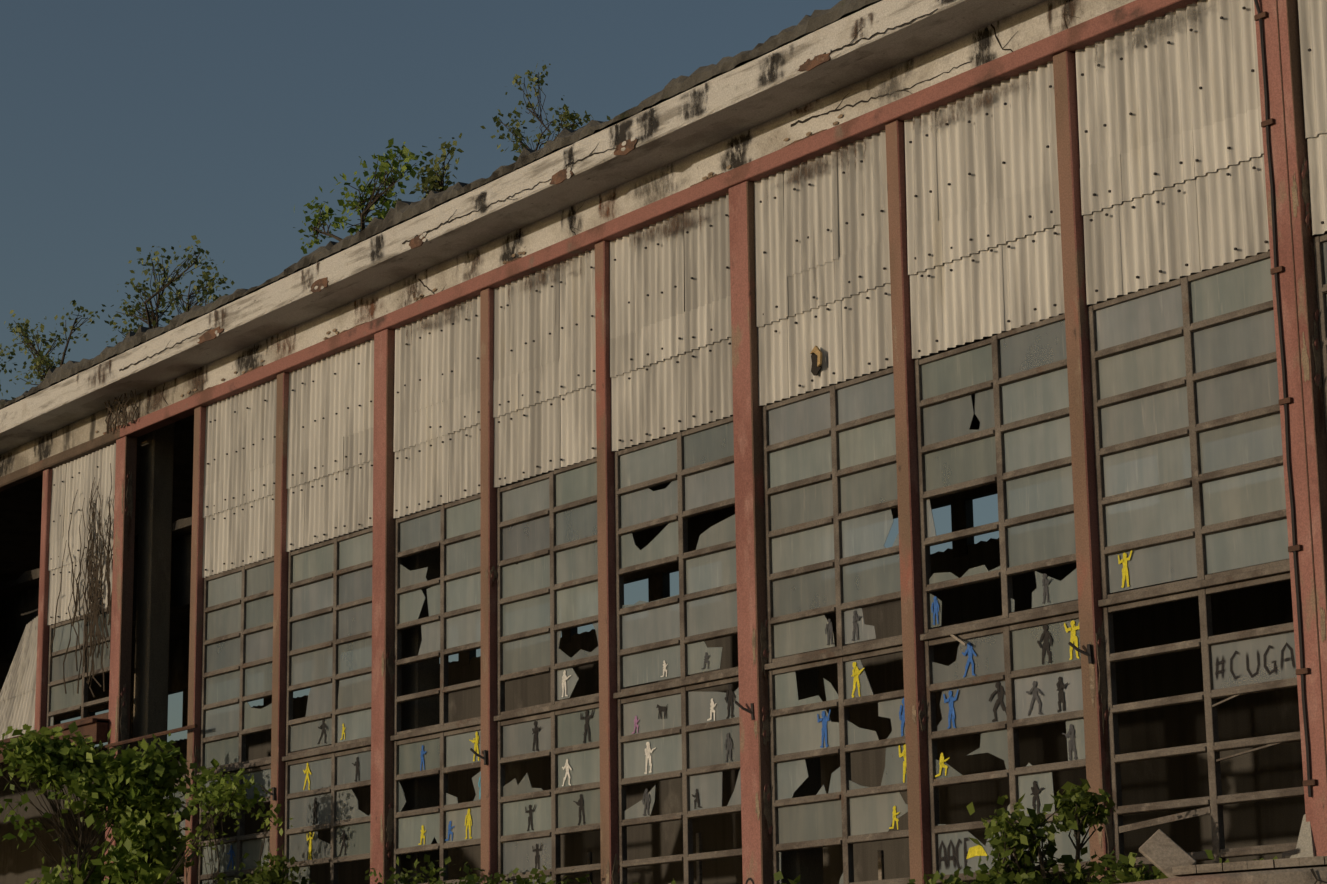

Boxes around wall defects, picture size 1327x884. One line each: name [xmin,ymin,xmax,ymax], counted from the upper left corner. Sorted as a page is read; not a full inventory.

damp [1047,0,1078,29]
crack [804,8,938,63]
damp [970,21,999,67]
crack [990,24,1018,52]
damp [759,47,792,86]
damp [683,83,707,119]
crack [791,62,970,127]
damp [610,110,659,148]
damp [721,131,751,170]
damp [475,192,487,213]
damp [370,236,383,261]
damp [501,229,523,261]